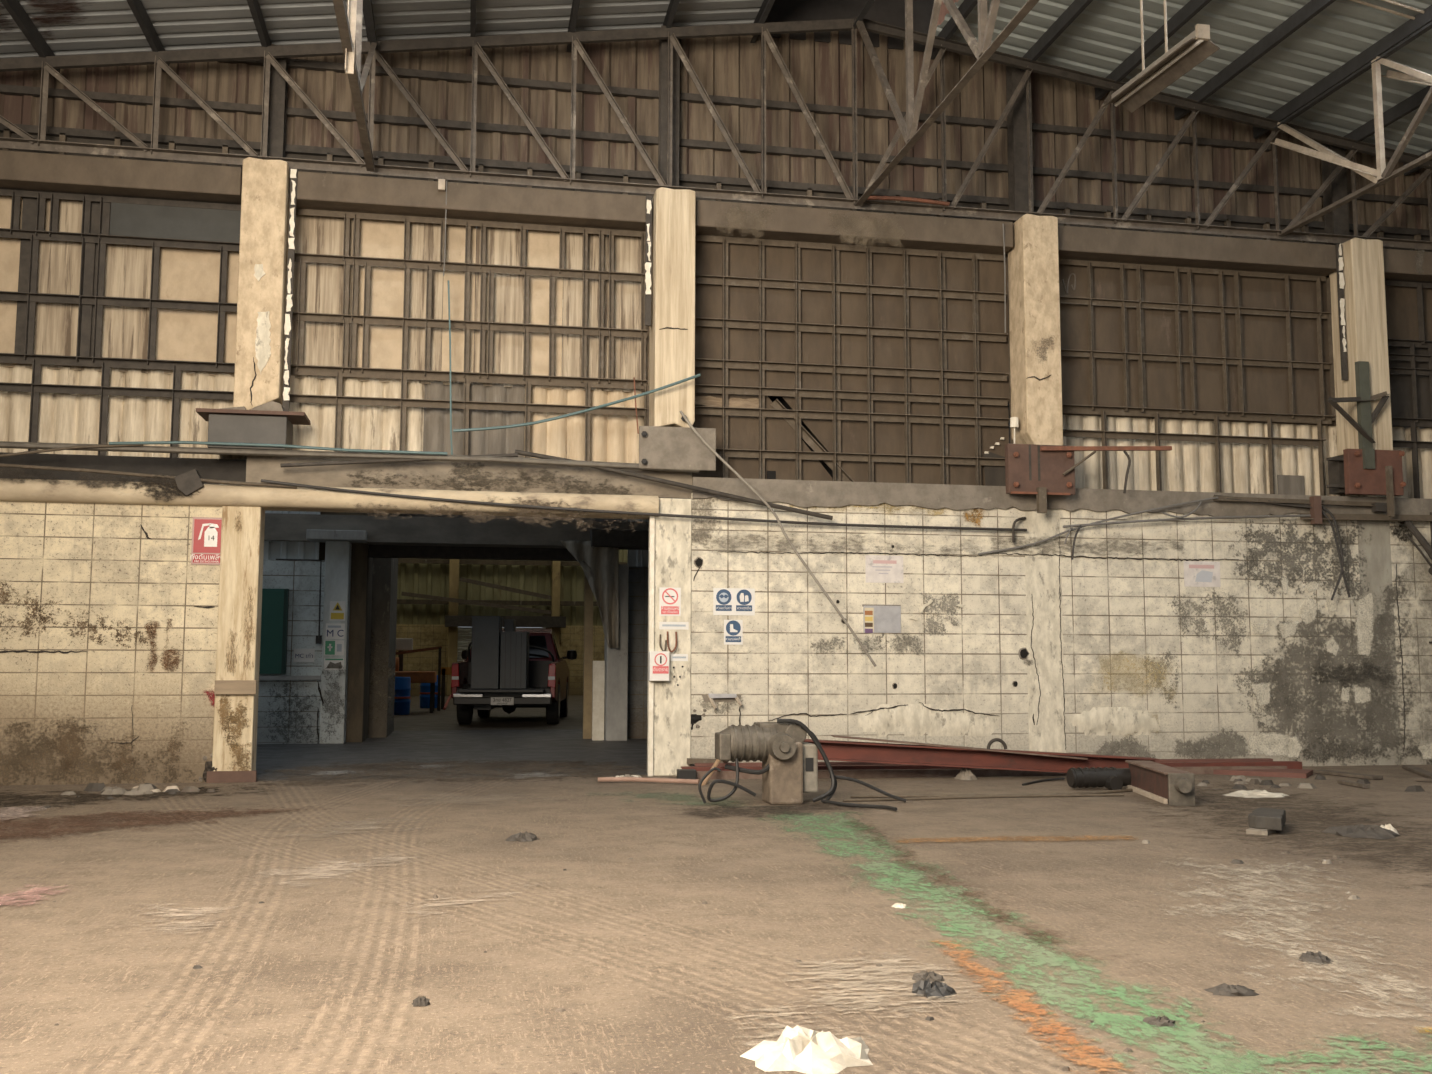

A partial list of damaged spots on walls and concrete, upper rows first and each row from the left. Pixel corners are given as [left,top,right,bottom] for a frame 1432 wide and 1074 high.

rust [27,0,84,40]
crack [693,537,1239,750]
damp [1144,652,1178,708]
damp [1168,519,1432,765]